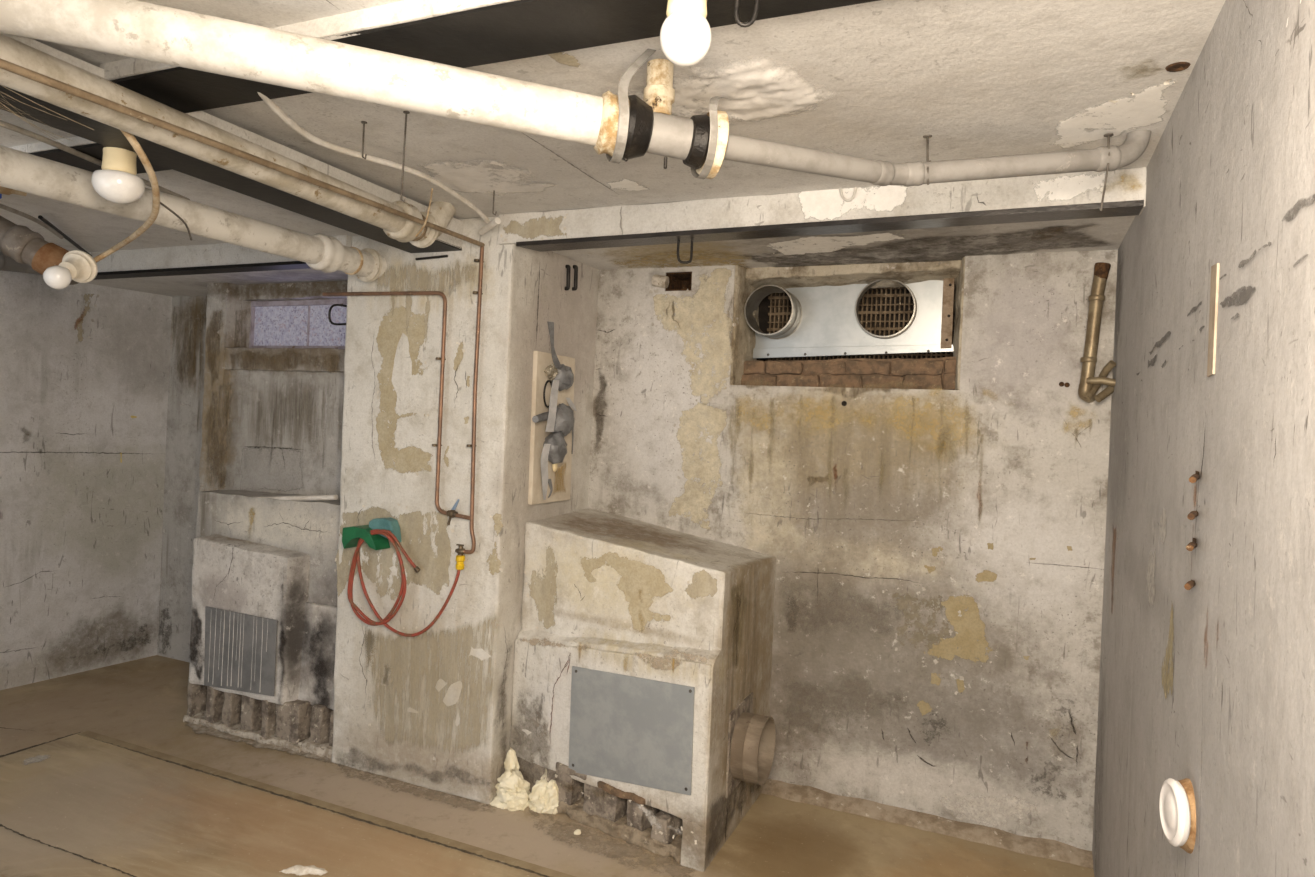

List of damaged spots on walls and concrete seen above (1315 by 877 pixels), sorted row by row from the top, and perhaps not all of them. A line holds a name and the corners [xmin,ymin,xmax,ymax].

peeling [1052,62,1191,148]
water stain [173,310,247,487]
peeling [376,306,449,476]
peeling [453,342,470,387]
flaking render [649,265,738,530]
peeling [523,538,558,630]
peeling [575,550,721,632]
peeling [882,546,997,695]